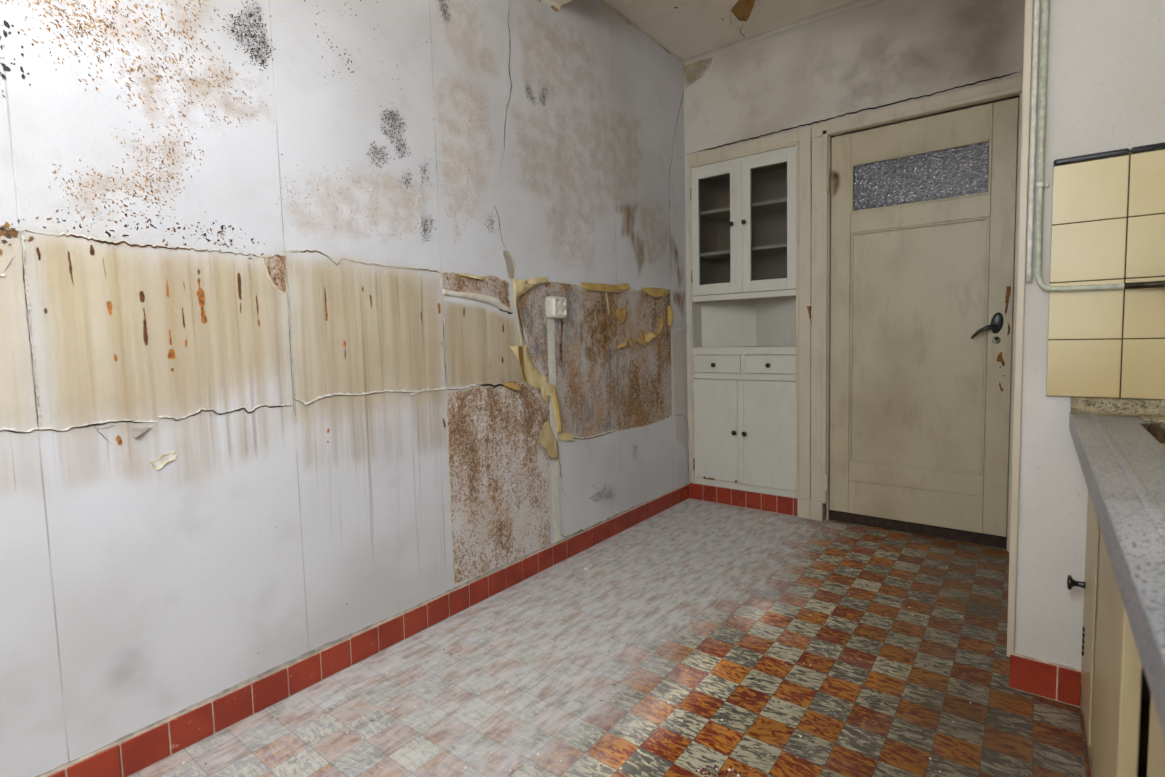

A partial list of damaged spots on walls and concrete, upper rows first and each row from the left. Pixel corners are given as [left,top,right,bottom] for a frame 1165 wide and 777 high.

mould [0,20,31,98]
mould [218,0,275,79]
crack [501,0,513,164]
crack [494,205,516,269]
rust [139,291,148,345]
rust [168,308,187,371]
rust [183,269,207,323]
crack [0,232,476,444]